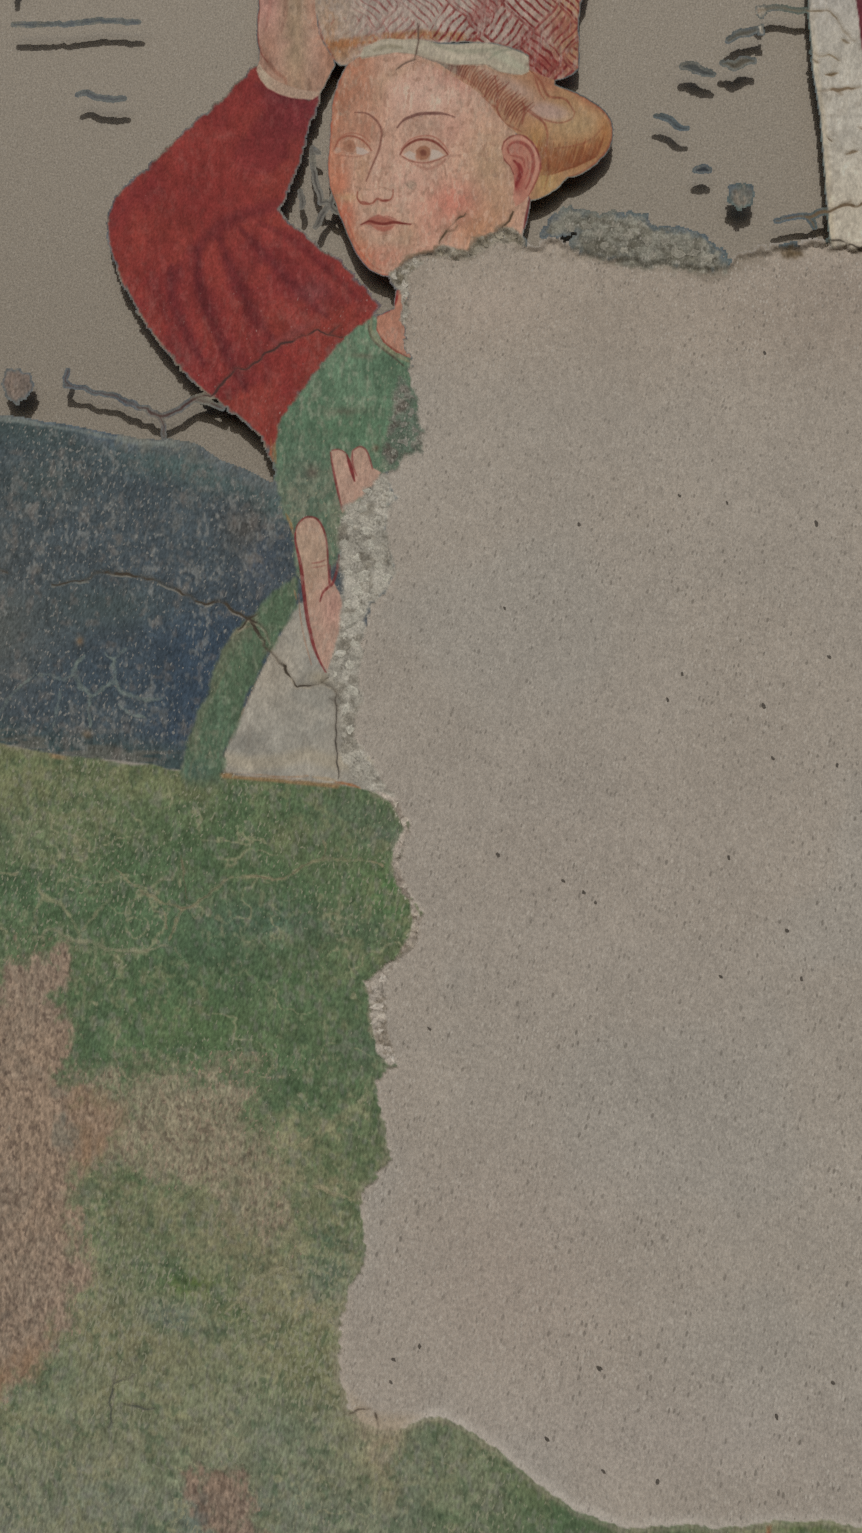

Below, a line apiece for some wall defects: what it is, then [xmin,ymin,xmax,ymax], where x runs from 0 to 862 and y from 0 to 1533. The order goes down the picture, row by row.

spalling [387,205,732,329]
crack [62,322,346,440]
crack [0,647,167,732]
crack [49,568,342,781]
spalling [325,373,428,1069]